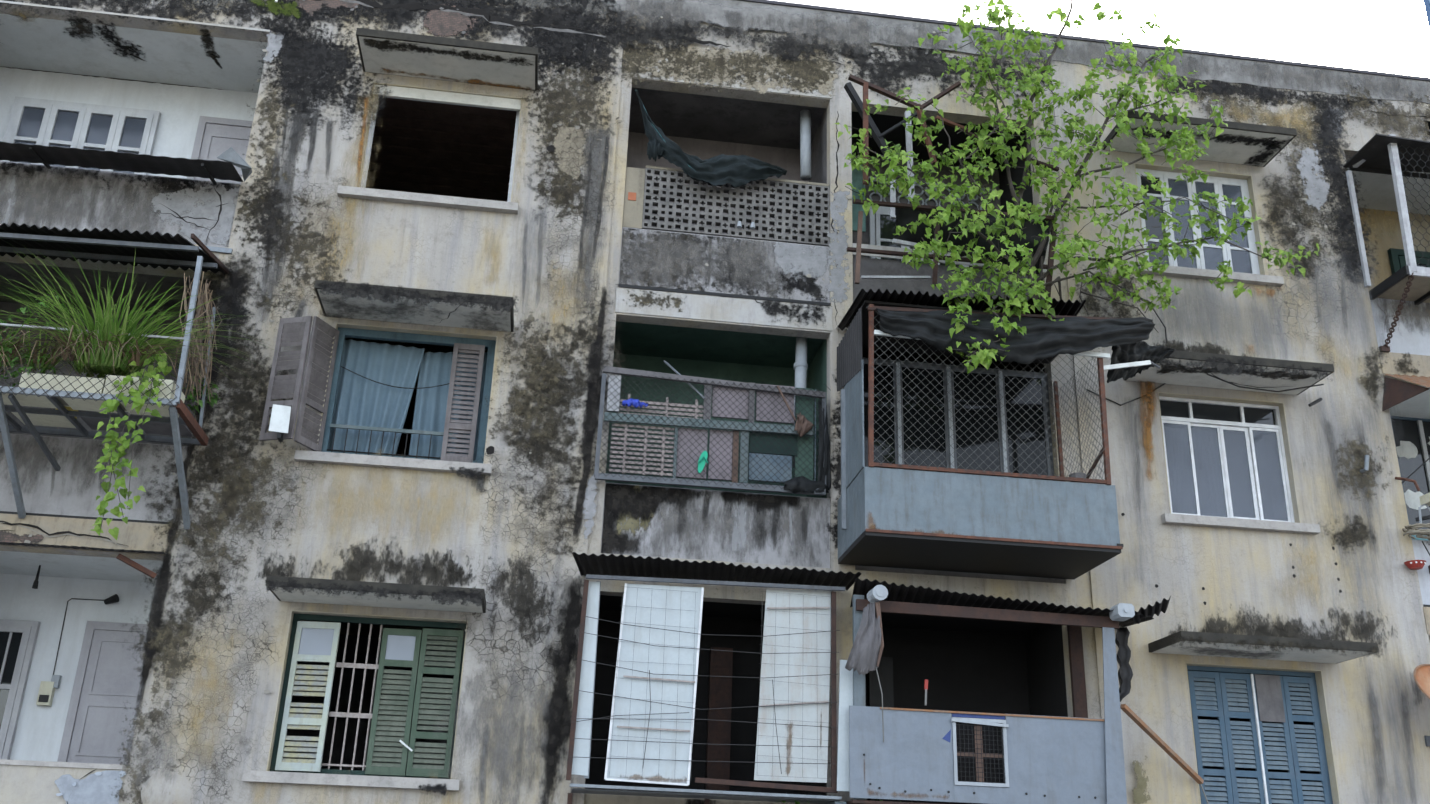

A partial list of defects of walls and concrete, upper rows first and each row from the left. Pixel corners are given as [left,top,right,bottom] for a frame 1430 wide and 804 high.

leakage [0,0,1421,559]
corrosion [1140,380,1156,478]
crack [0,520,128,548]
leakage [131,461,248,712]
leakage [1169,552,1393,658]
peeling [54,612,200,804]
leakage [258,539,584,804]
leakage [1370,690,1384,793]
leakage [1402,682,1421,800]